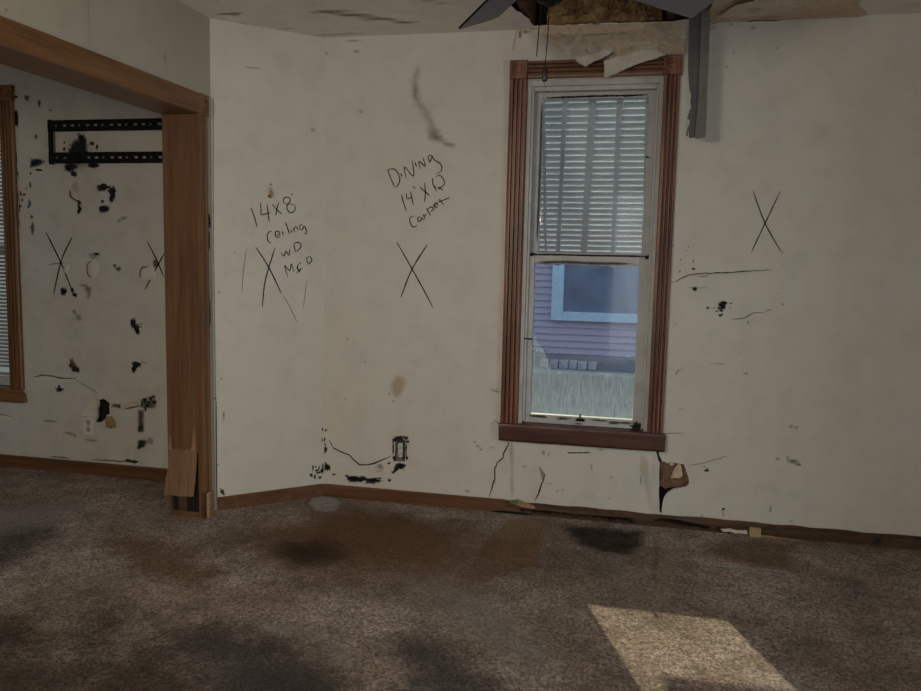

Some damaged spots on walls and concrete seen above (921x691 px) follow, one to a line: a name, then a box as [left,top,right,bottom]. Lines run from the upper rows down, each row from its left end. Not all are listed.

peeling [709,0,867,45]
crack [670,245,773,285]
spalling [81,394,141,429]
crack [535,465,550,503]
spalling [659,461,689,512]